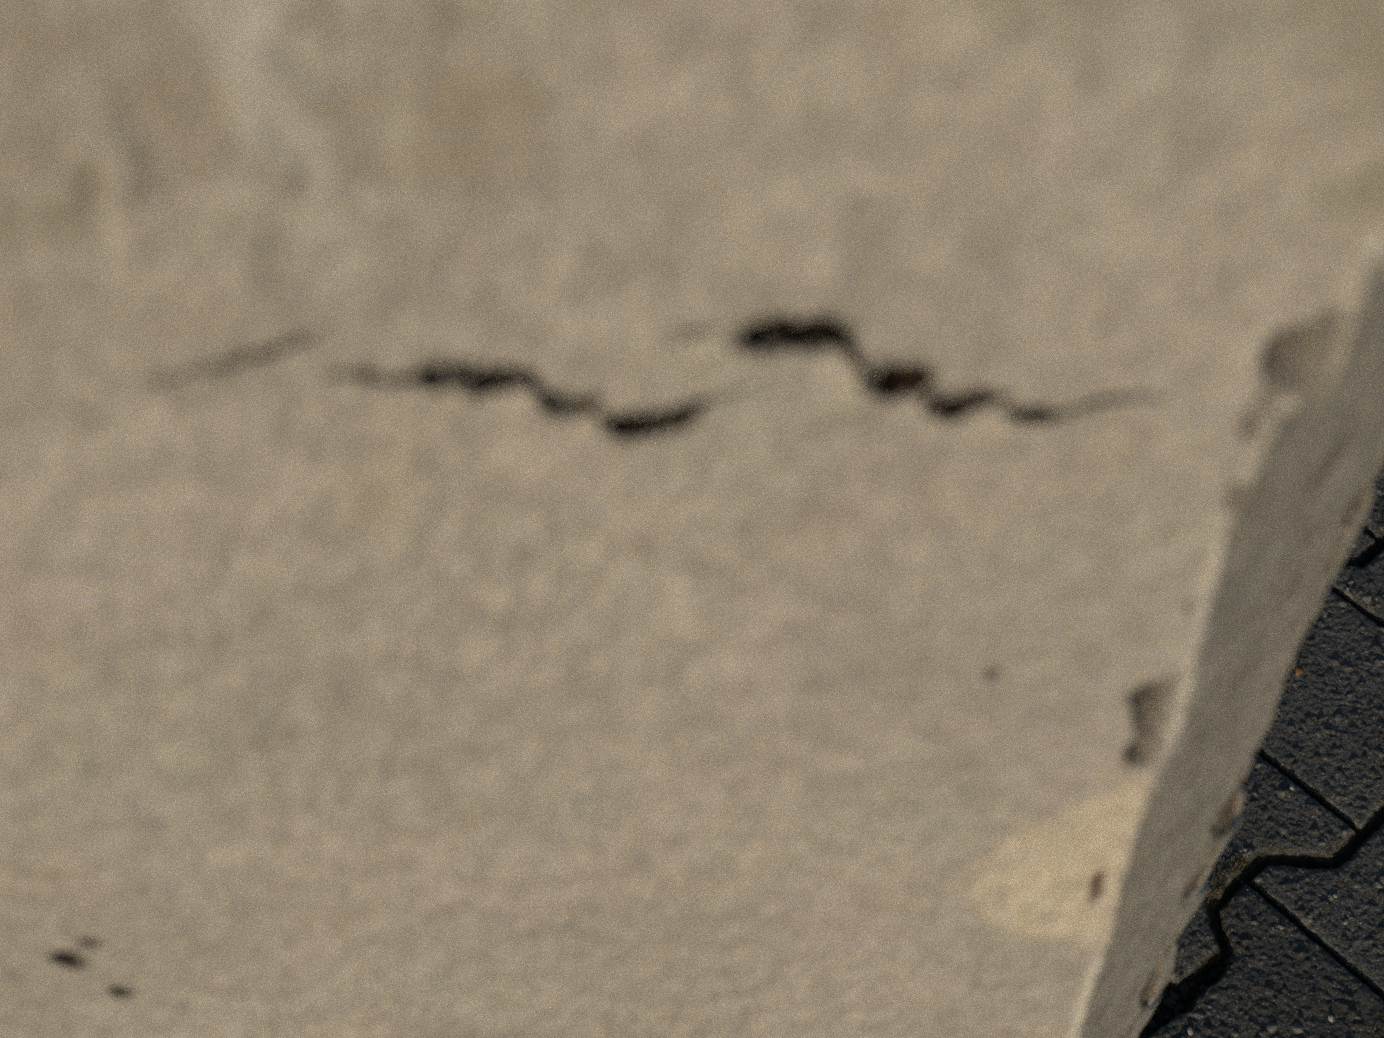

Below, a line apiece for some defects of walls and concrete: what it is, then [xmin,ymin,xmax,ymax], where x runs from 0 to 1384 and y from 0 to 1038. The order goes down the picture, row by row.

crack [158,331,319,385]
crack [334,307,1172,452]
spalling [1238,304,1356,444]
peeling [958,675,1187,950]